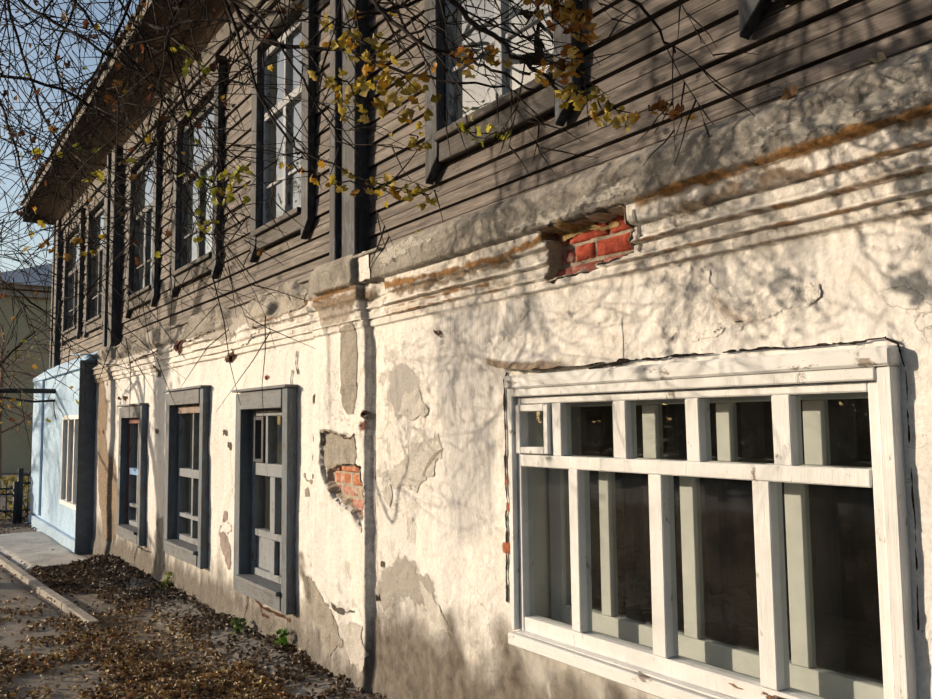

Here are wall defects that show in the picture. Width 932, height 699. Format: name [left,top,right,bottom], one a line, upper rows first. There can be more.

flaking render [505,182,641,284]
flaking render [303,321,442,532]
crack [589,336,910,442]
peeling [375,555,454,637]
crack [911,468,920,630]
damp [376,616,618,699]